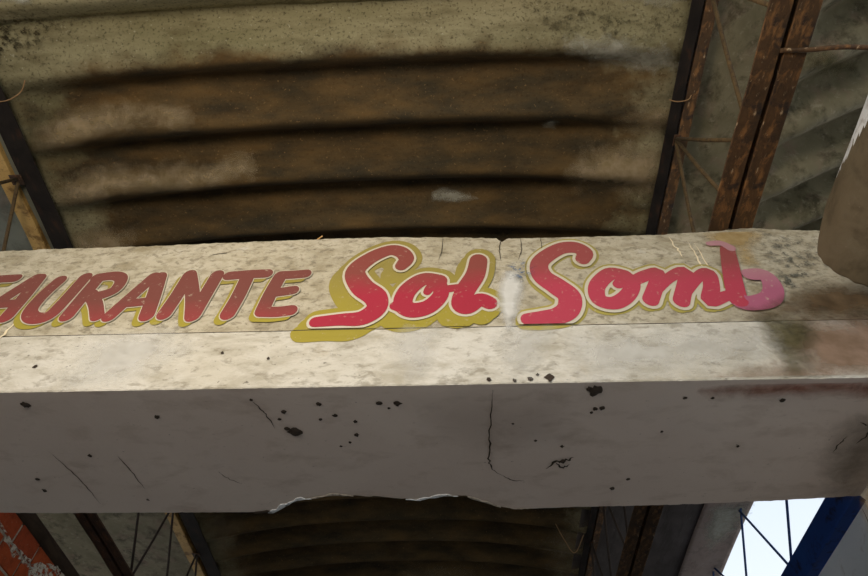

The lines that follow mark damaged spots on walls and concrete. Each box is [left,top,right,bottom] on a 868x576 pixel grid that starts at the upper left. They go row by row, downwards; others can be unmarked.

damp [52,111,131,144]
damp [71,175,169,199]
damp [579,152,654,190]
damp [79,233,121,248]
crack [487,393,516,481]